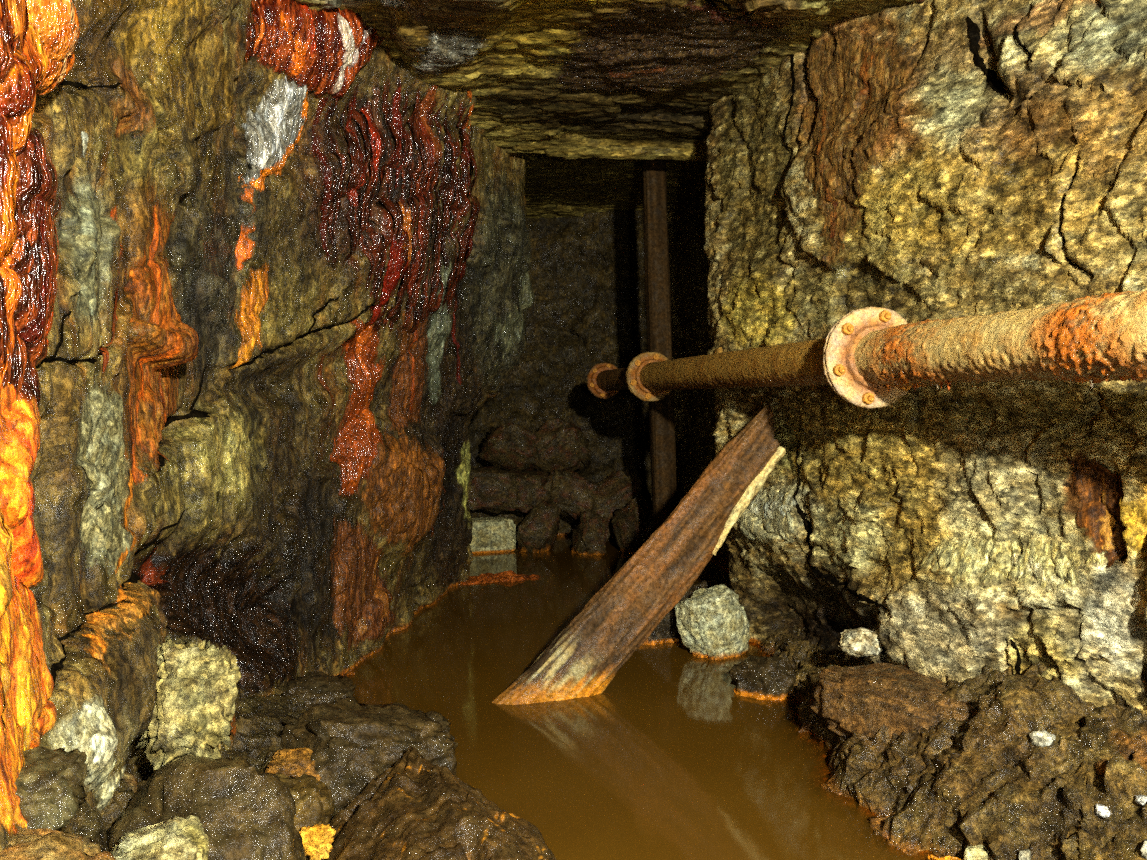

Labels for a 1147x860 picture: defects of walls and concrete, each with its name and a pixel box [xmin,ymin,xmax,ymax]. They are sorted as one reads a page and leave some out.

crack [966,16,1006,96]
crack [1014,26,1033,62]
rust [244,186,255,209]
crack [1059,173,1091,275]
rust [231,228,270,368]
rust [311,75,480,497]
rust [0,128,61,832]